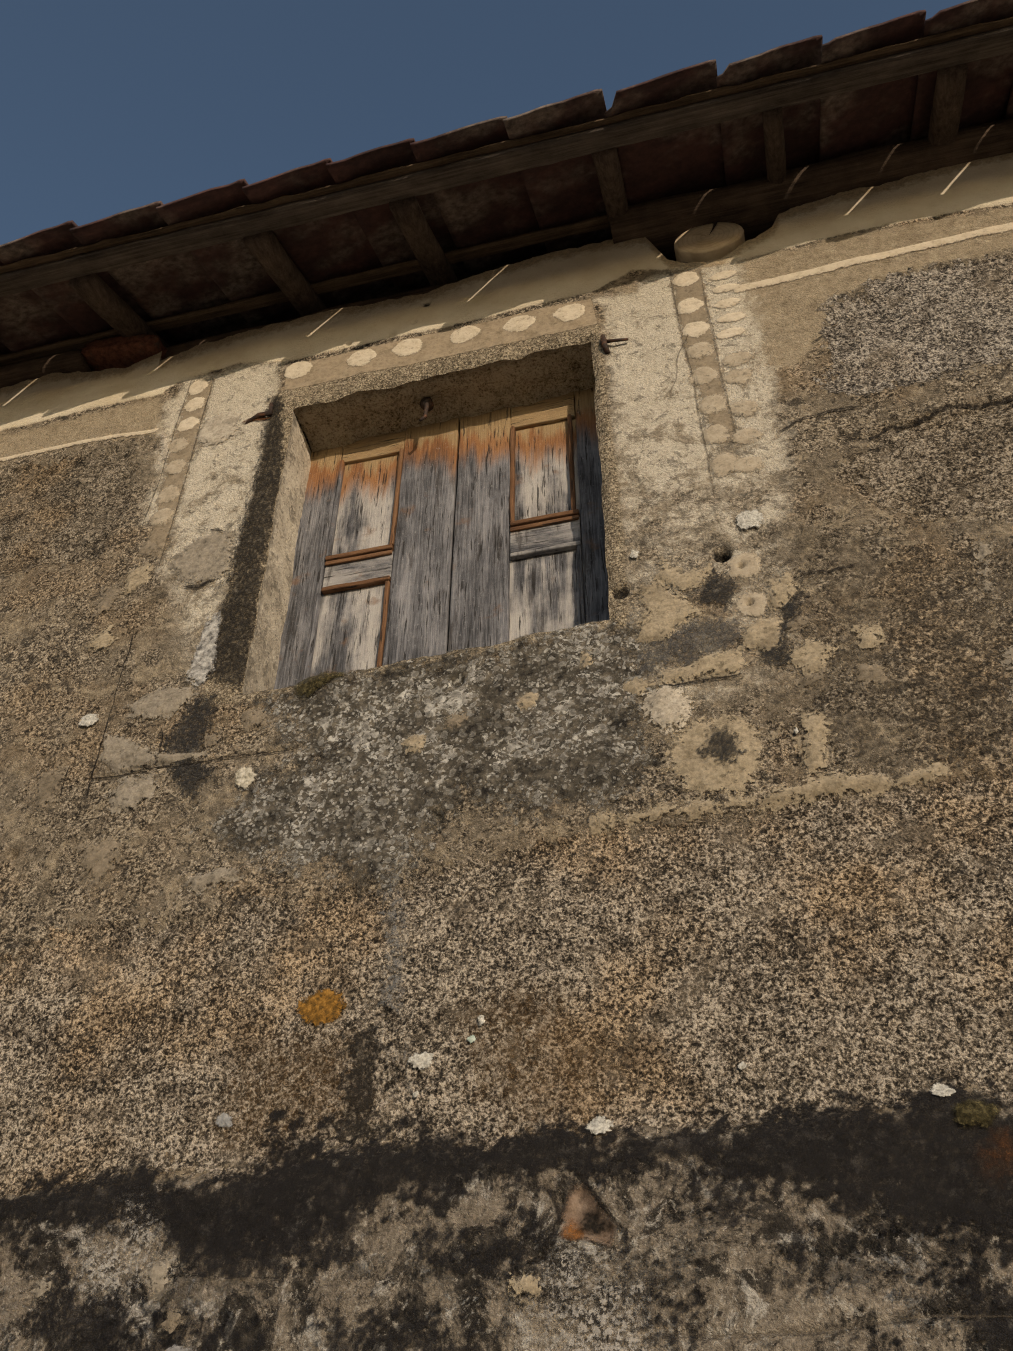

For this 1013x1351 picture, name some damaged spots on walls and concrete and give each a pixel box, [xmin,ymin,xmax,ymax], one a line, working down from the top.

crack [779,396,1013,440]
peeling [81,529,236,652]
damp [157,395,288,803]
peeling [621,557,900,699]
peeling [973,539,1003,600]
peeling [122,685,199,723]
peeling [516,692,539,711]
peeling [998,645,1013,703]
spalling [0,705,1013,1199]
damp [0,1025,1013,1351]
spalling [562,1185,616,1246]